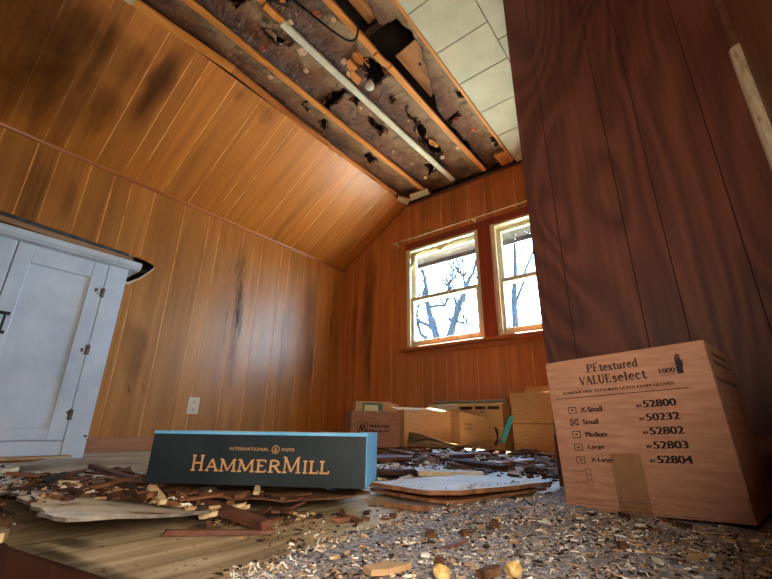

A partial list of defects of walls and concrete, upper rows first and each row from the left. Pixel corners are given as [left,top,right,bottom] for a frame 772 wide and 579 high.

water stain [143,62,174,108]